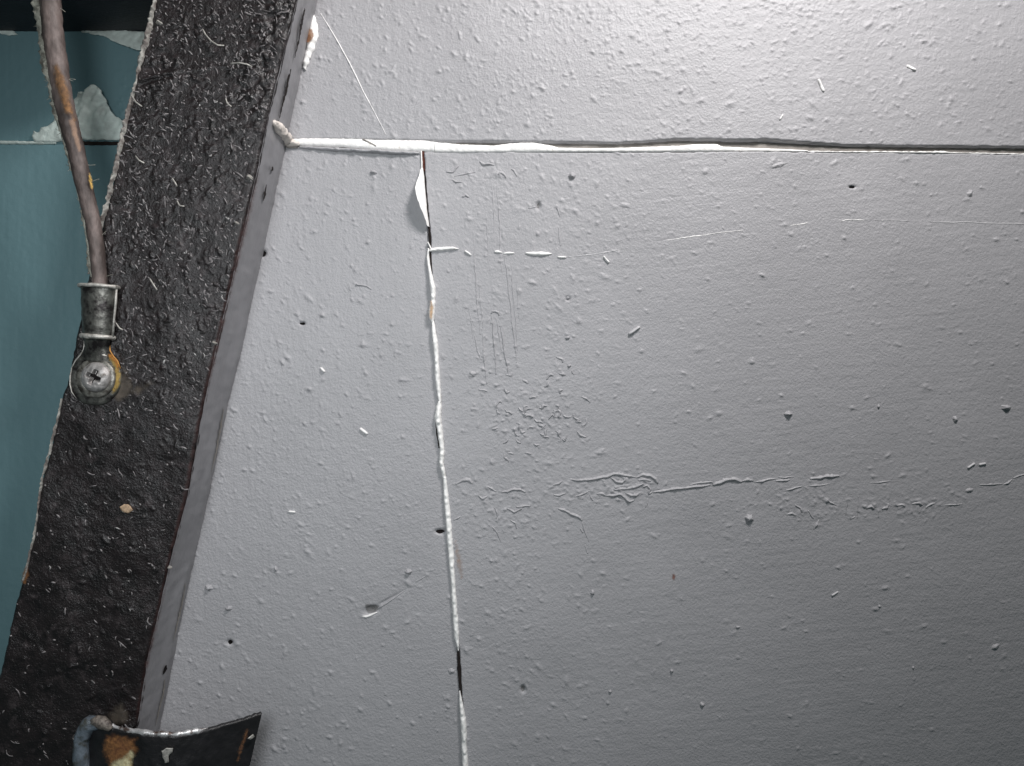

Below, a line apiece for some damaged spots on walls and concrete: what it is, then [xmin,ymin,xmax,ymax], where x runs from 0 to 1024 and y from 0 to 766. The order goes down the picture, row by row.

peeling [81,30,144,50]
peeling [32,119,62,142]
peeling [74,84,123,141]
crack [273,120,1024,766]